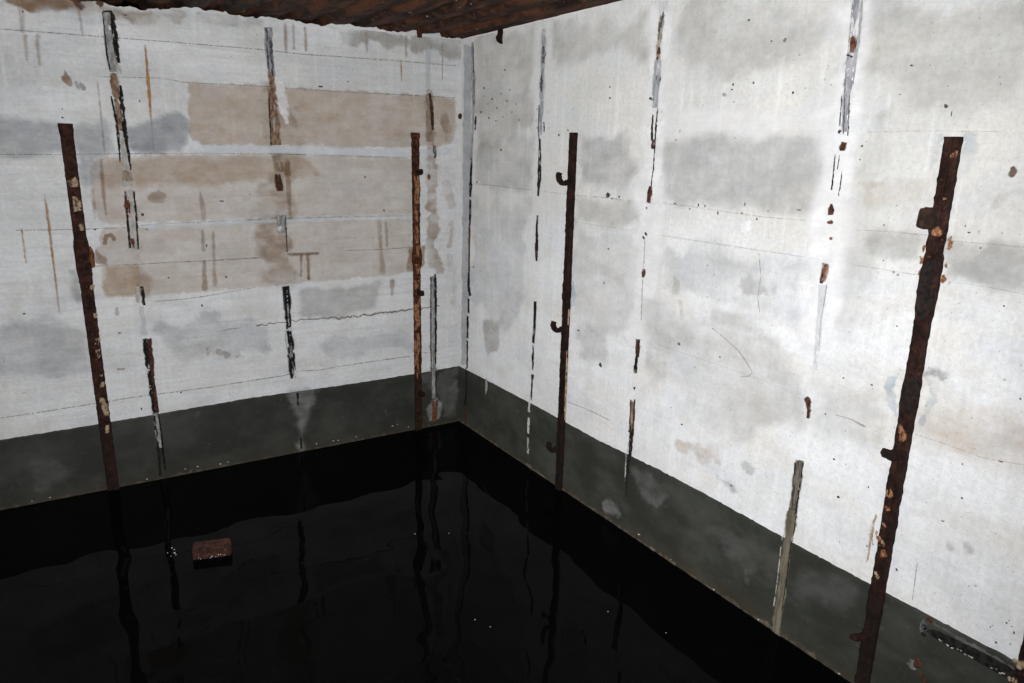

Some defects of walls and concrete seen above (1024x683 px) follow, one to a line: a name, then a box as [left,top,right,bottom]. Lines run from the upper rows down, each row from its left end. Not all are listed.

rust [110,73,122,131]
rust [268,72,281,145]
crack [5,10,477,424]
rust [275,174,283,191]
crack [2,274,439,476]
leakage [0,366,871,683]
leakage [870,593,1017,683]